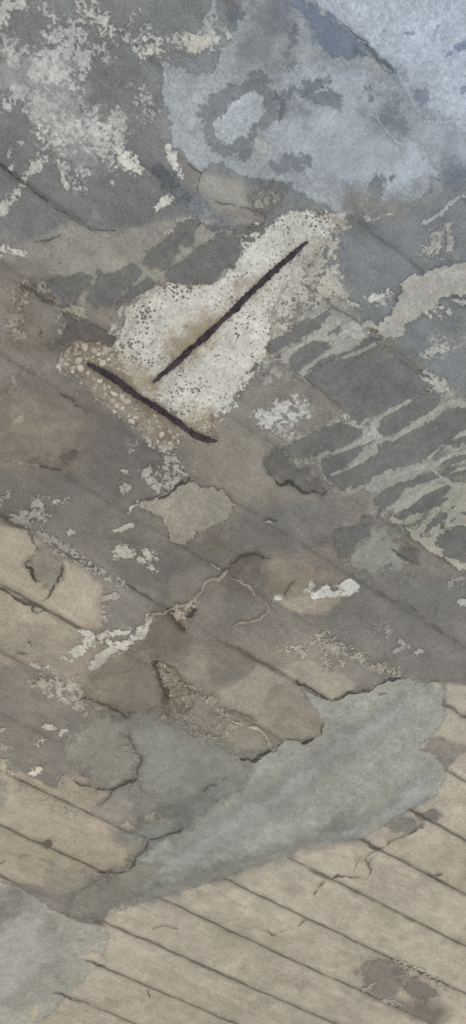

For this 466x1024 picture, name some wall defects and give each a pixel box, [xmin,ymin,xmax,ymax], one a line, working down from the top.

water stain [419,193,466,262]
peeling [2,0,466,579]
water stain [277,289,394,377]
water stain [249,393,314,445]
water stain [329,328,466,476]
water stain [365,430,466,510]
crack [391,548,421,565]
crack [125,552,466,718]
peeling [0,658,453,1024]
water stain [120,700,443,903]
water stain [0,891,64,1001]